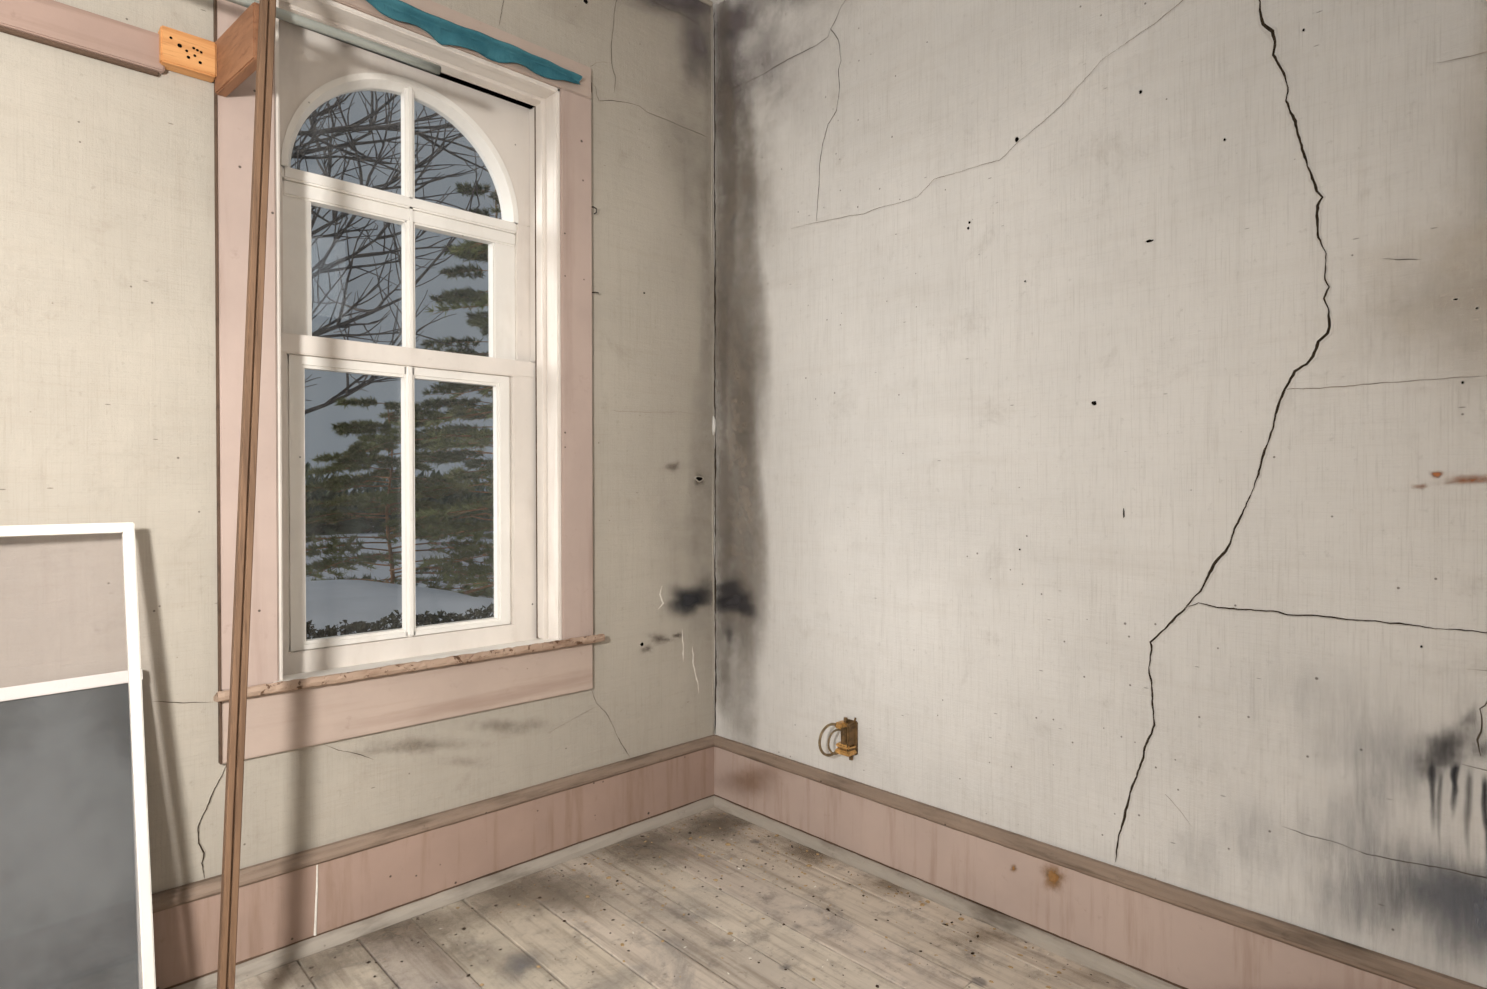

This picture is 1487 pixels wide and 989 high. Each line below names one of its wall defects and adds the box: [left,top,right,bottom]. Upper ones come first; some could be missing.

leakage [648,0,762,623]
crack [592,0,1183,734]
crack [1115,0,1487,862]
rust [1432,472,1487,483]
leakage [1429,735,1459,803]
crack [1285,827,1487,878]
leakage [1413,876,1487,946]